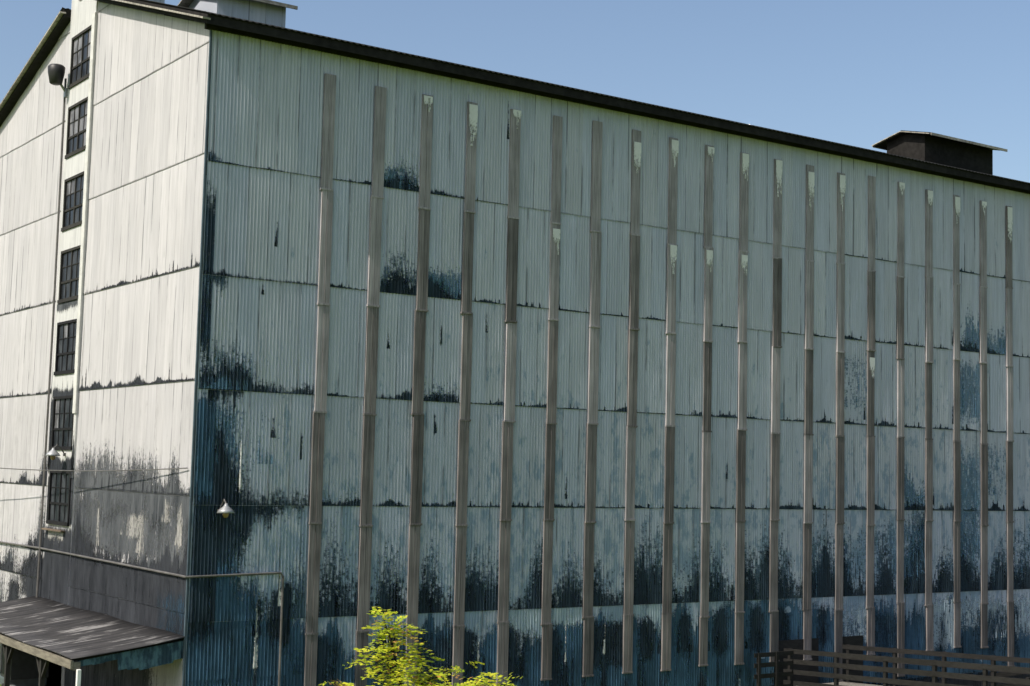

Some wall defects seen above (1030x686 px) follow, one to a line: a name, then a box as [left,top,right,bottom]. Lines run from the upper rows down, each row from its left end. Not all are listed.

damp [384,161,464,199]
damp [1,255,316,315]
damp [380,251,461,300]
damp [475,299,589,313]
damp [781,331,1030,358]
damp [363,384,504,405]
damp [563,403,768,420]
damp [783,407,1006,433]
damp [0,339,360,643]
damp [316,479,1030,686]
damp [251,553,307,686]
damp [64,659,154,686]